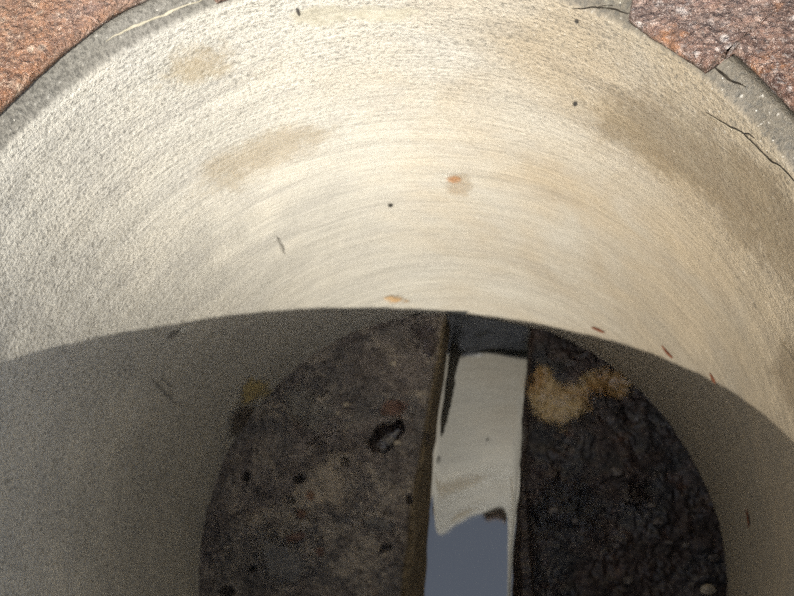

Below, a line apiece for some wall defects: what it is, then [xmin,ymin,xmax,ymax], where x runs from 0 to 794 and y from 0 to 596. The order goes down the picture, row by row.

crack [572,5,629,14]
crack [715,67,746,87]
crack [707,113,794,182]